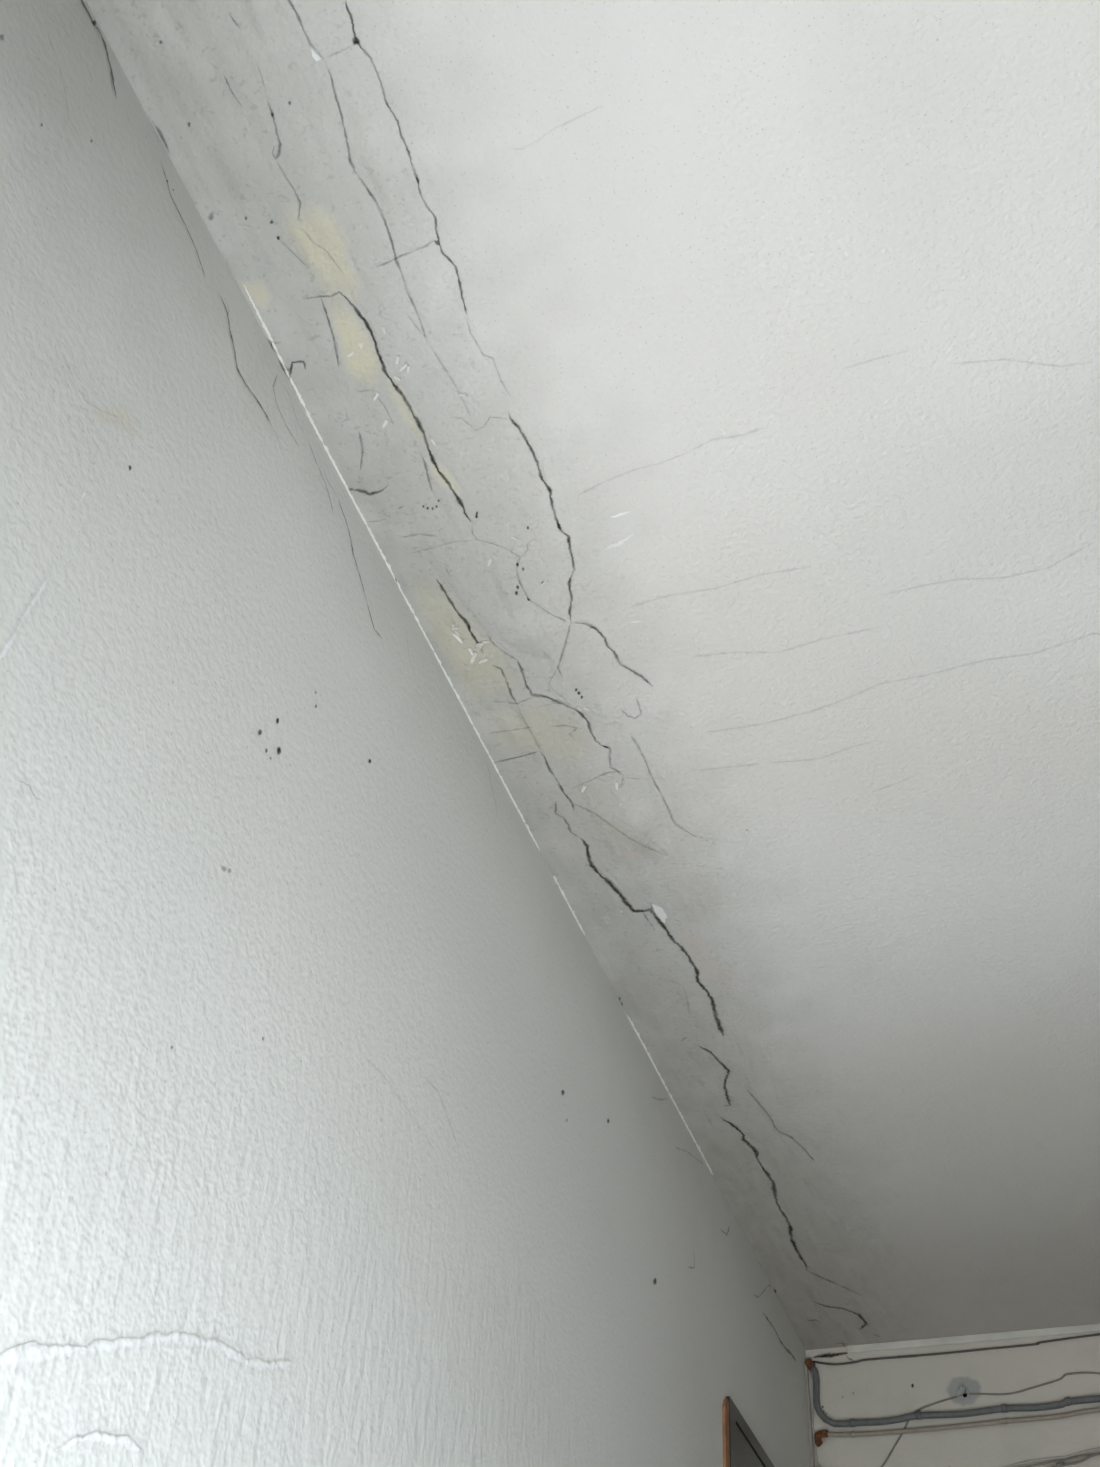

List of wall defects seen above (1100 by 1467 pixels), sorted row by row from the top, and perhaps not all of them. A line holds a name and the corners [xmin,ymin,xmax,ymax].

crack [346,5,362,49]
crack [370,103,466,311]
crack [346,298,471,522]
crack [437,580,478,643]
crack [508,665,608,748]
crack [510,418,648,683]
crack [583,840,807,1268]
crack [766,1304,867,1359]